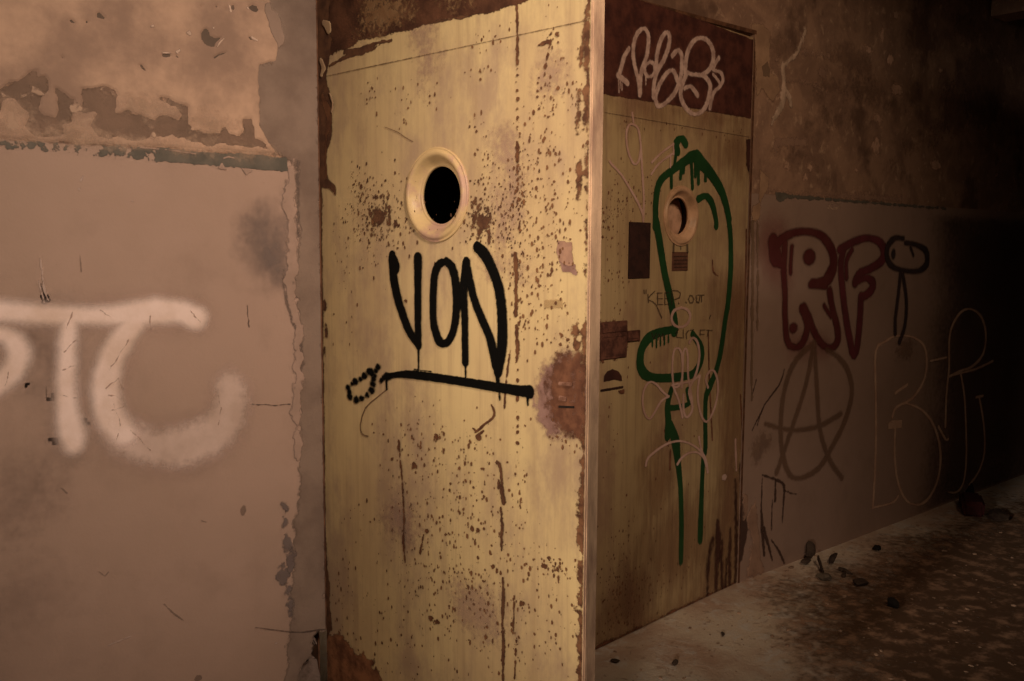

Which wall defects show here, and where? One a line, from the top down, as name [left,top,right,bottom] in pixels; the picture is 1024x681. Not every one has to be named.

peeling [0,0,285,170]
corrosion [317,0,590,681]